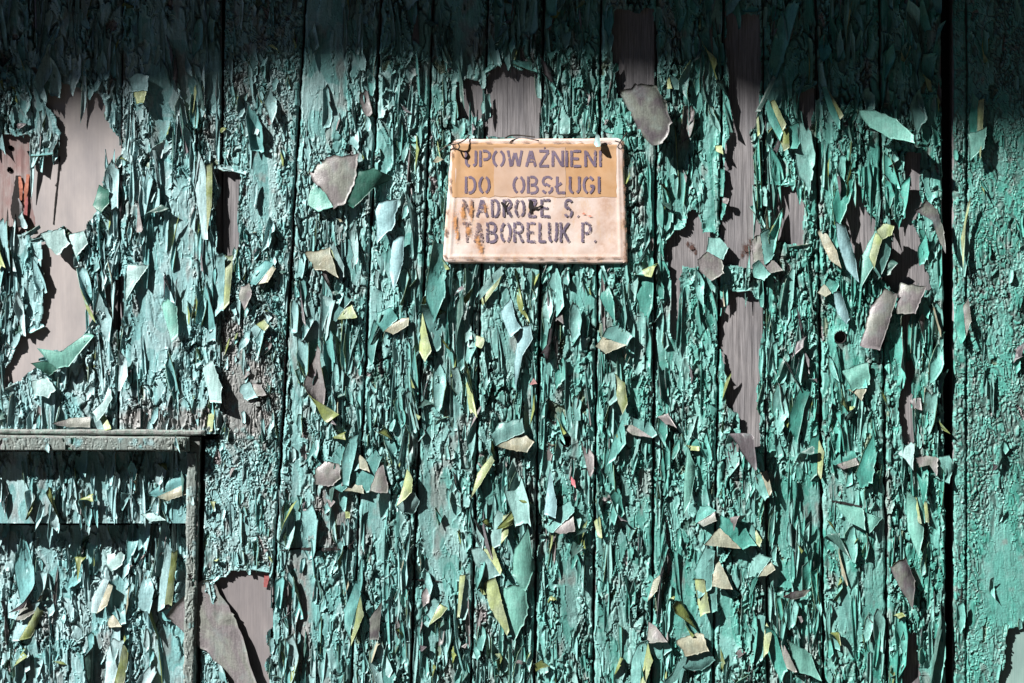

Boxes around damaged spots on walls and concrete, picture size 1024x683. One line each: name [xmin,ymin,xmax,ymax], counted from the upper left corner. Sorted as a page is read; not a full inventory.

peeling [0,0,123,431]
peeling [0,436,198,683]
peeling [118,0,597,683]
peeling [539,0,1024,683]